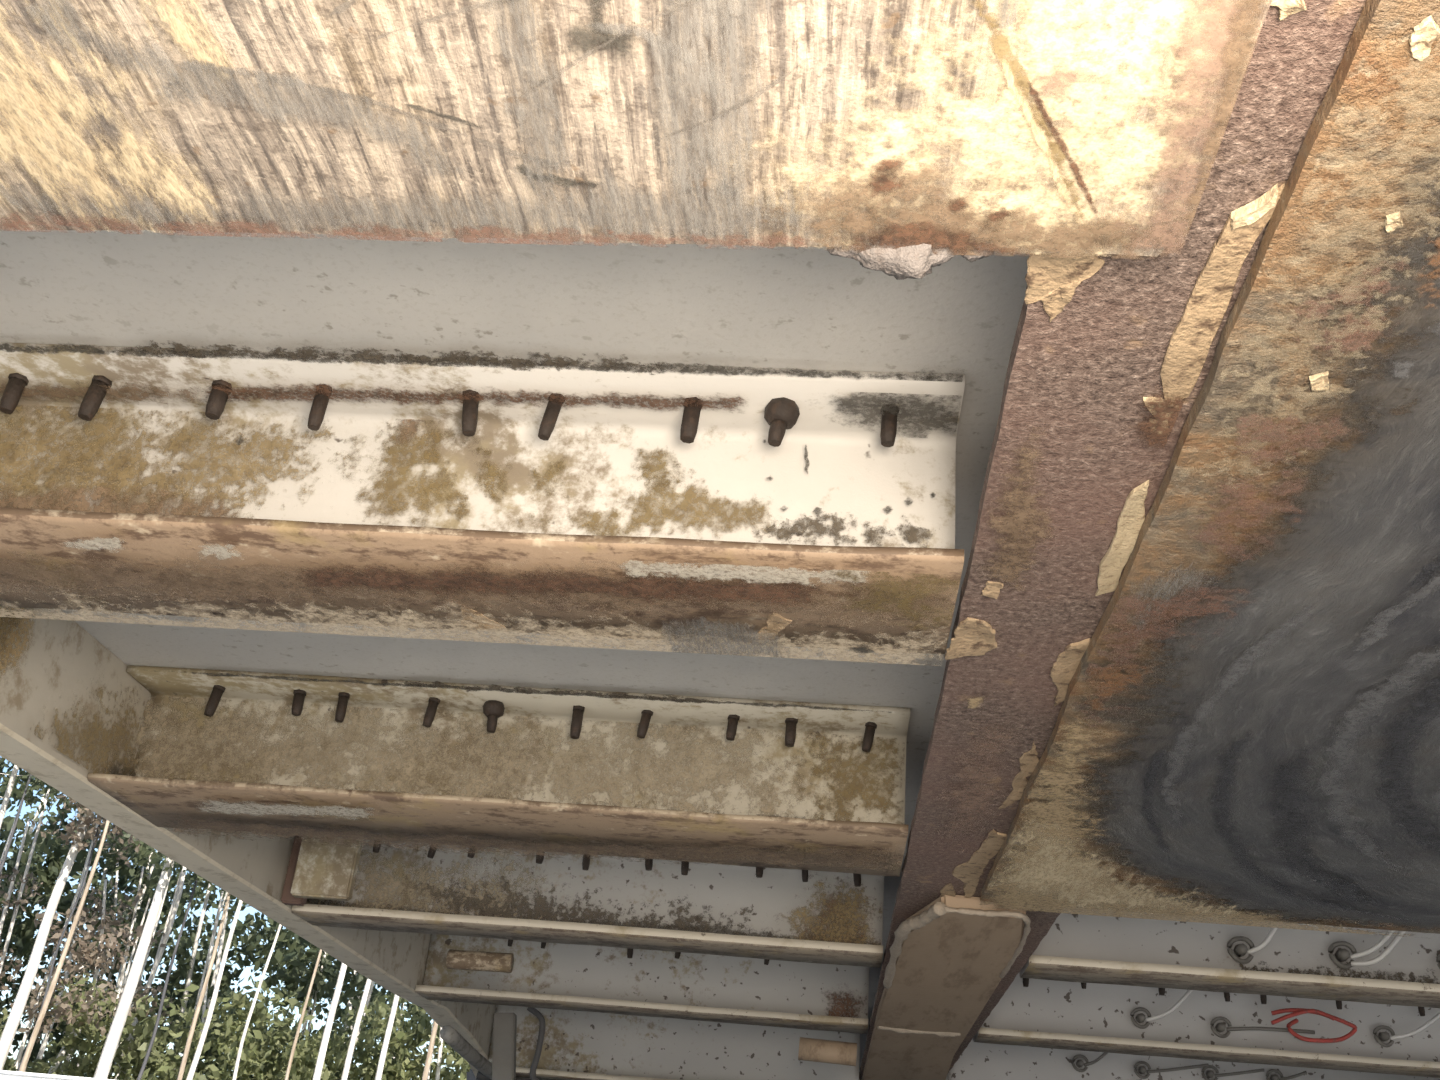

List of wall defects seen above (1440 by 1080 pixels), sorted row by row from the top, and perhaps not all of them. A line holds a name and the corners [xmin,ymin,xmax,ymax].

peeling [1138,183,1285,447]
rust [1295,261,1404,352]
leakage [756,498,933,548]
peeling [1095,480,1149,596]
leakage [1356,555,1440,651]
peeling [1050,637,1092,706]
leakage [1142,606,1313,853]
leakage [1212,649,1440,920]